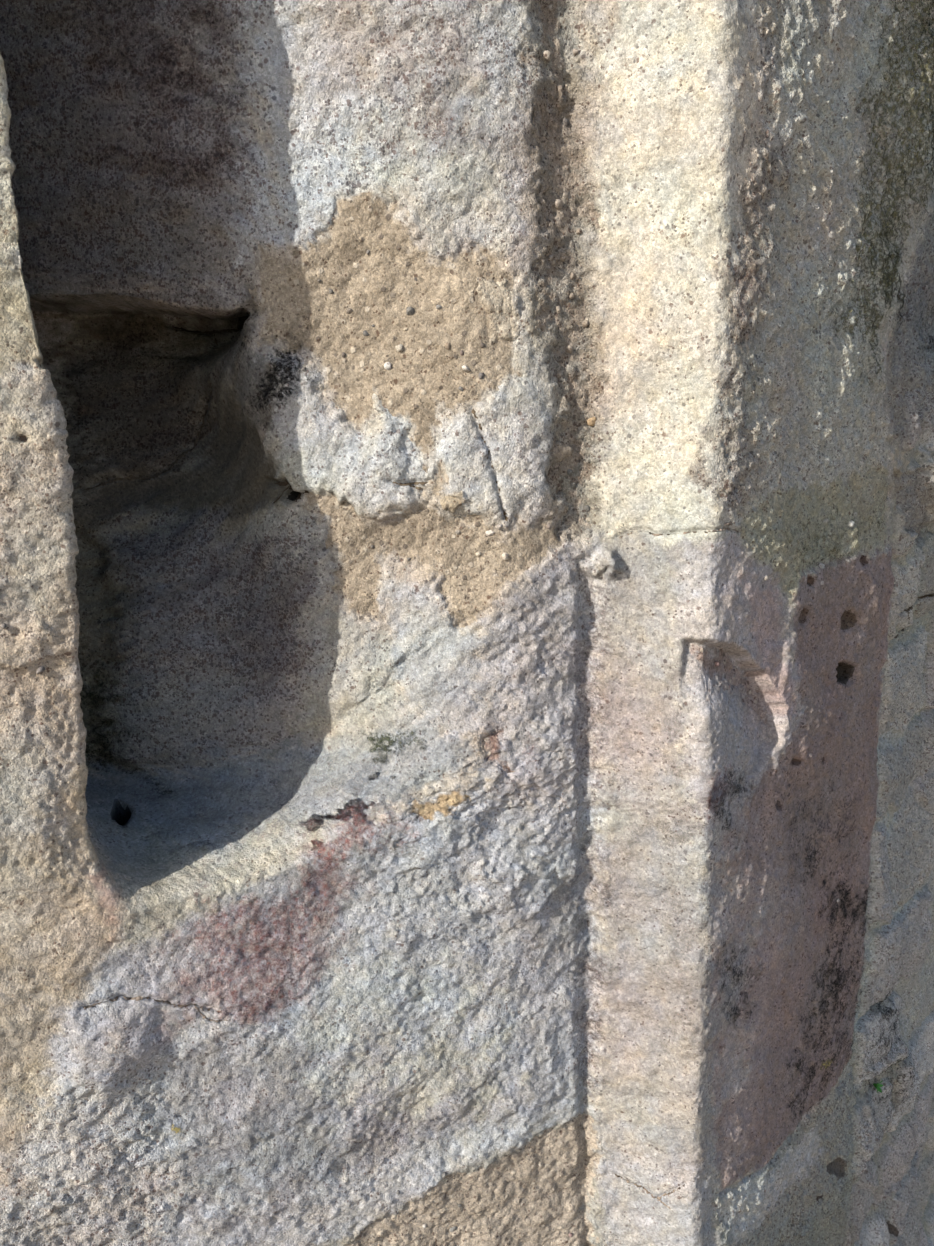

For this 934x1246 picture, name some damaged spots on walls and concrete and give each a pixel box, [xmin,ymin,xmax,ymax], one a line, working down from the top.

spalling [249,0,609,629]
crack [471,409,508,521]
crack [83,995,228,1023]